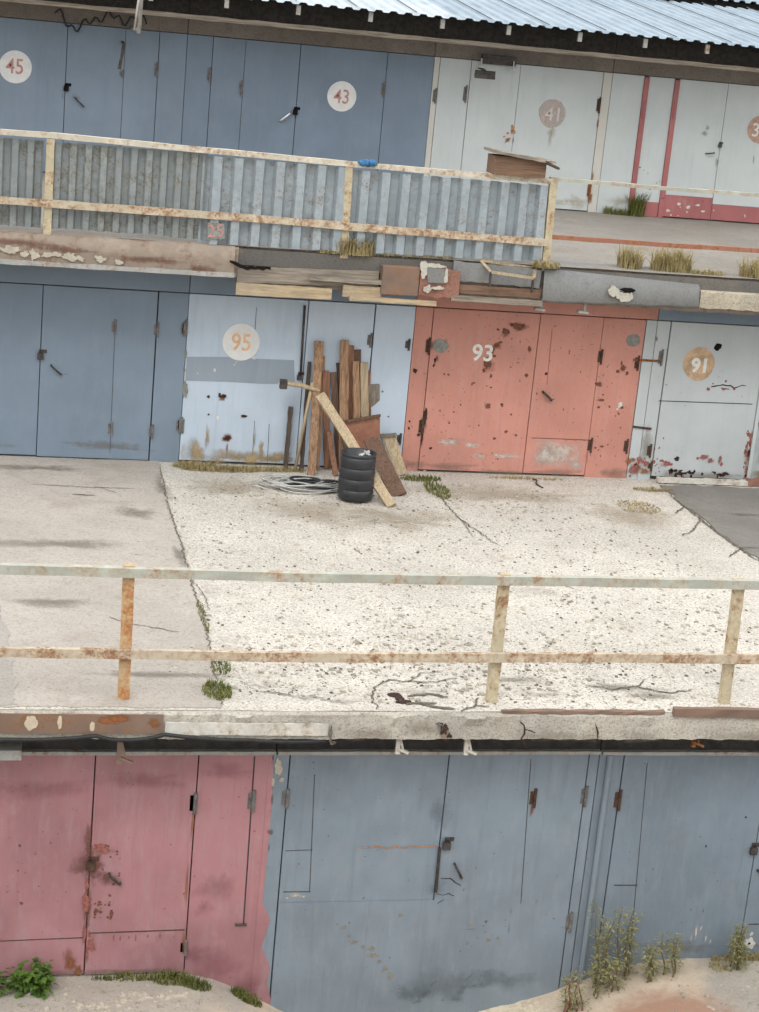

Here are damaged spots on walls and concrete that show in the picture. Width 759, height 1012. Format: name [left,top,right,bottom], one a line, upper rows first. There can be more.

corrosion [0,239,82,252]
peeling [0,245,124,265]
peeling [183,349,198,398]
peeling [629,437,730,478]
peeling [743,430,752,478]
crack [435,488,497,544]
crack [669,493,758,560]
crack [158,463,223,704]
corrosion [98,715,128,724]
corrosion [66,953,82,976]